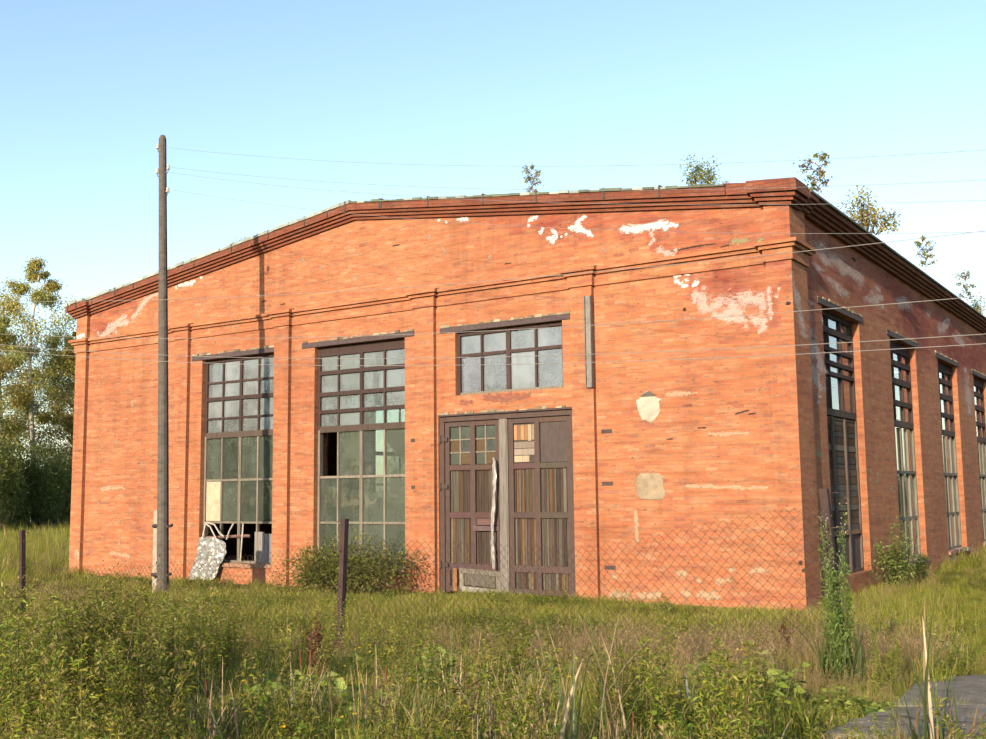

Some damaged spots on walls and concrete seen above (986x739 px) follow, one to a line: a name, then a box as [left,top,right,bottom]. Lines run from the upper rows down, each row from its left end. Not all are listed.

damp [673,274,700,288]